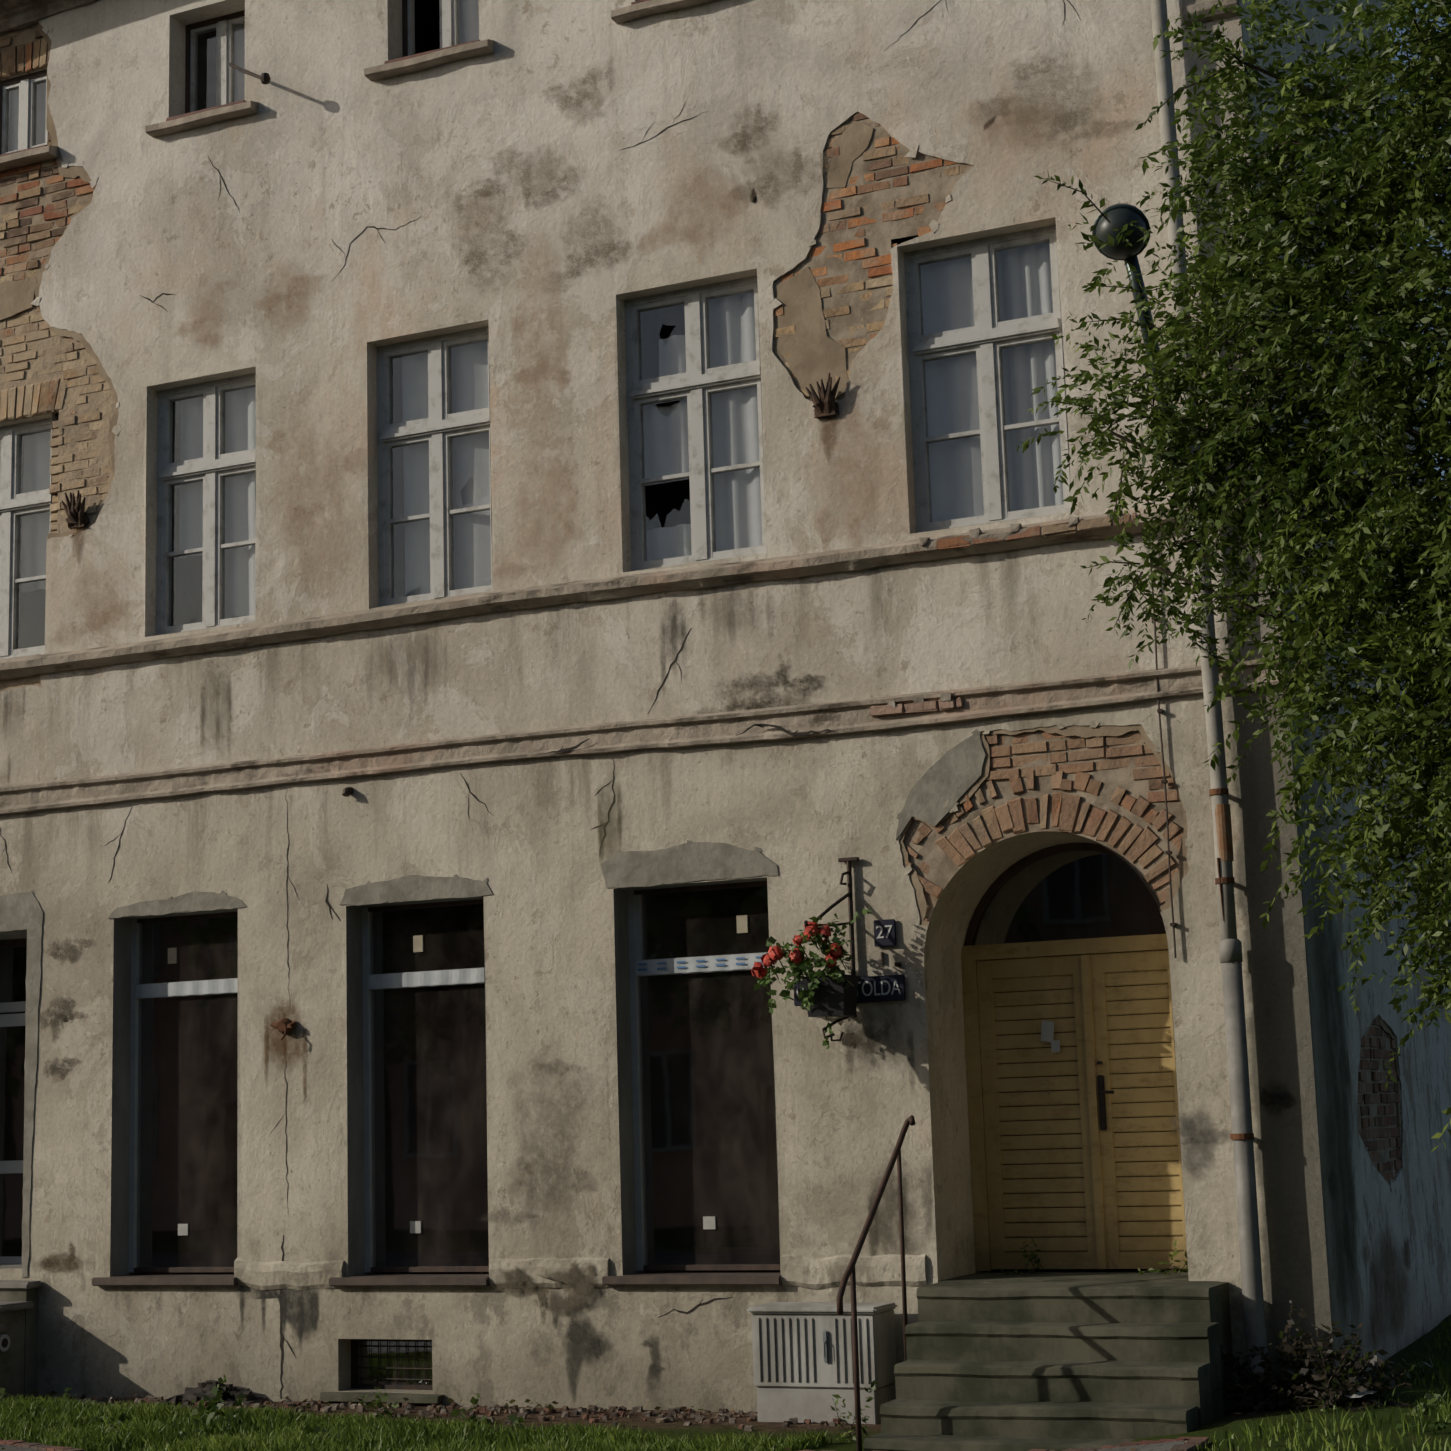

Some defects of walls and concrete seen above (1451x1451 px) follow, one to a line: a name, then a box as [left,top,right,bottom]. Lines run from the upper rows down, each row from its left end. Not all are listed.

crack [207,155,240,212]
crack [621,103,704,150]
flaking render [0,23,121,539]
crack [332,217,420,275]
flaking render [769,112,973,404]
flaking render [0,675,42,692]
crack [647,629,691,715]
crack [545,738,615,857]
flaking render [897,720,1193,926]
corrosion [264,1009,306,1067]
flaking render [1357,1015,1404,1191]
crack [271,1054,296,1399]